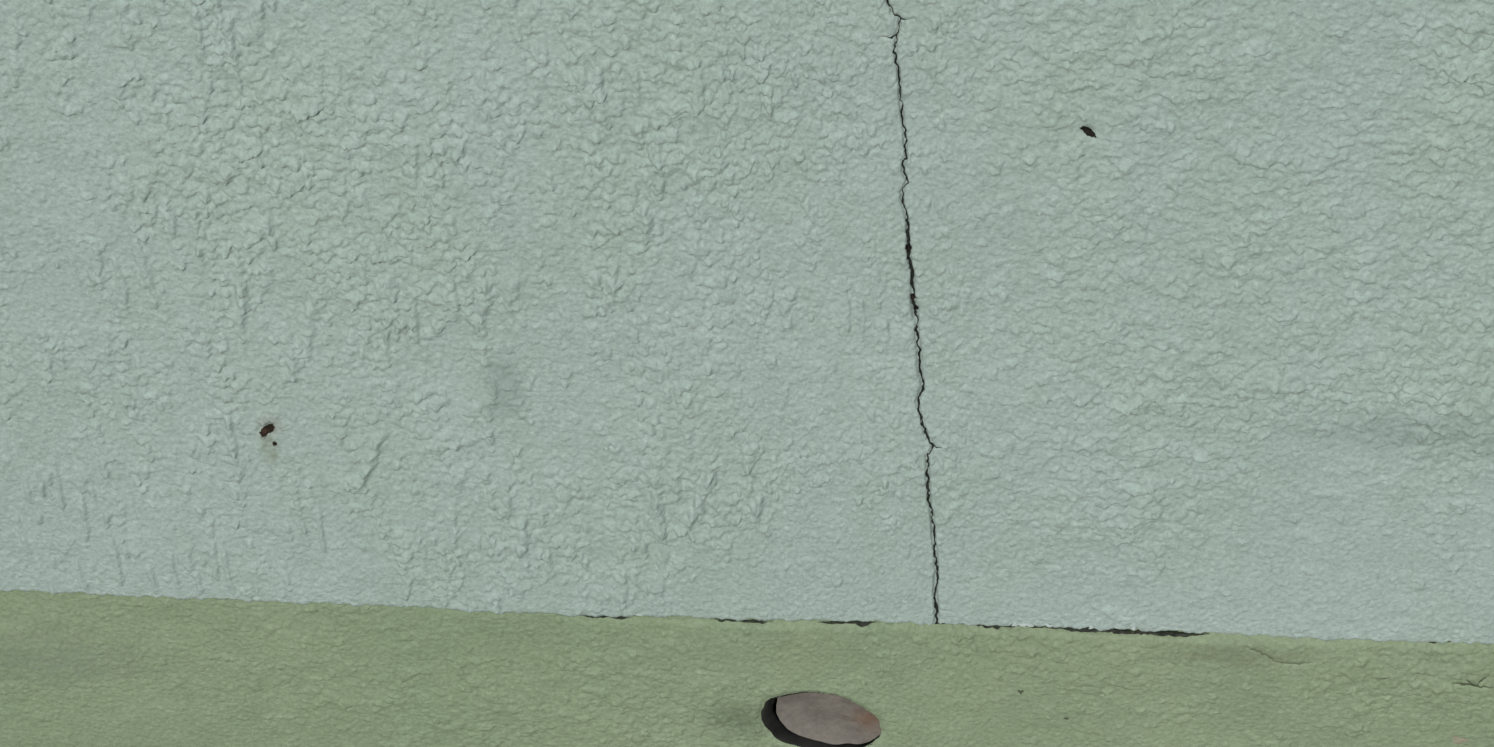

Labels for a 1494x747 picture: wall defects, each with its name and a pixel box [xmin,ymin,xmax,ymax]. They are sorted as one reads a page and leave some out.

crack [881,0,941,624]